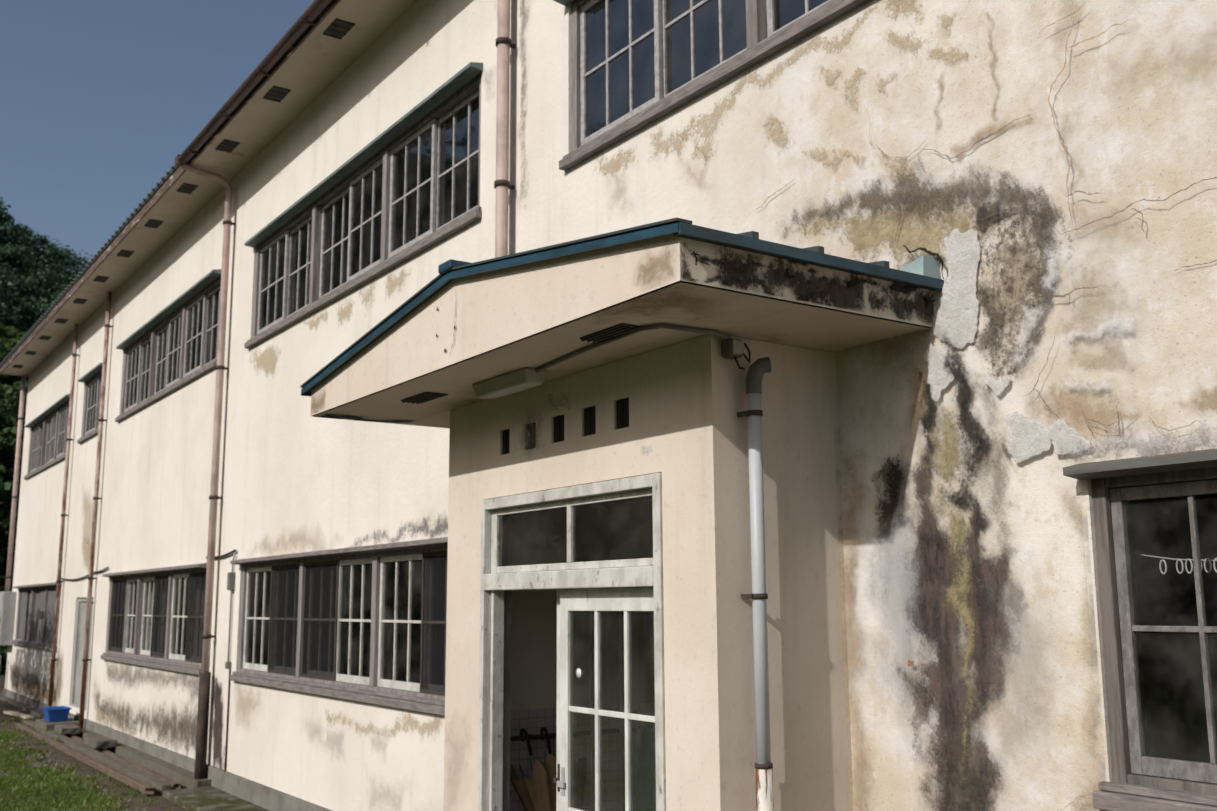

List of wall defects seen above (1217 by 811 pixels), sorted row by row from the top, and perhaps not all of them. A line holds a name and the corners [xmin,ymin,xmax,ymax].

leakage [650,0,968,163]
crack [869,3,1217,234]
leakage [643,243,934,325]
crack [895,204,944,309]
leakage [783,154,1059,369]
spalling [798,195,1071,402]
crack [1018,285,1101,305]
peeling [1066,316,1132,340]
crack [1028,336,1204,444]
leakage [354,517,448,547]
leakage [872,335,1020,811]
leakage [93,666,224,770]